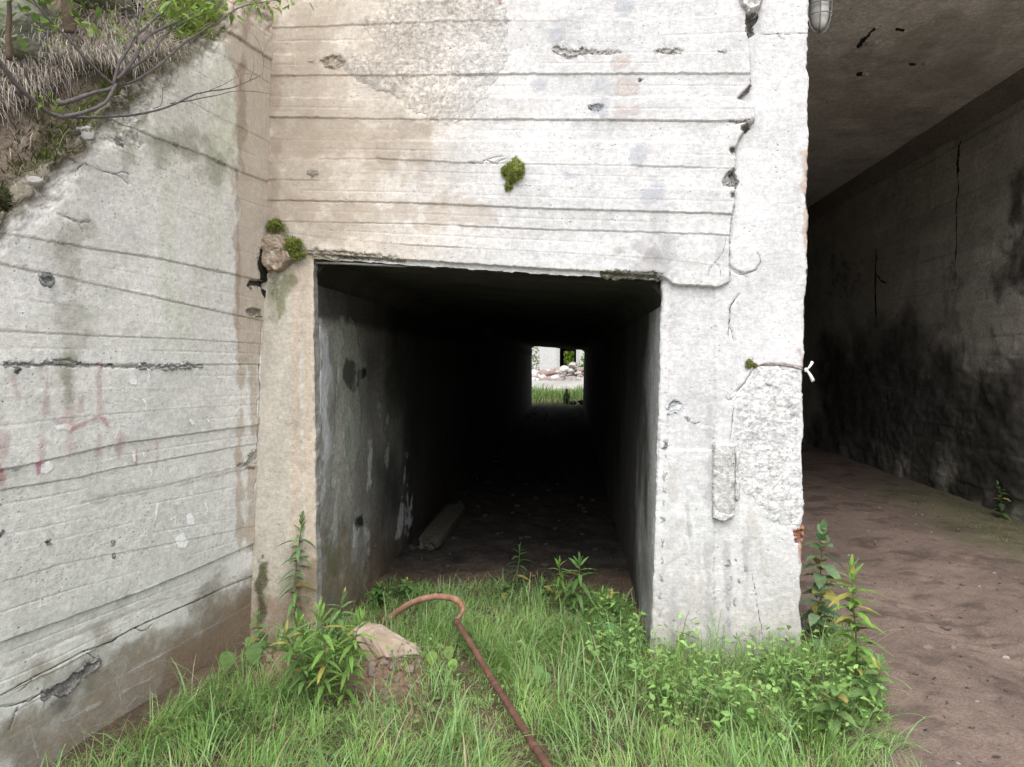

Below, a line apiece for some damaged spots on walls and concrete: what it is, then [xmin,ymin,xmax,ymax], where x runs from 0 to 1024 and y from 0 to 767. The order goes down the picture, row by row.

spalling [306,0,511,125]
spalling [551,44,617,59]
spalling [653,46,682,55]
spalling [721,168,740,198]
crack [953,140,961,281]
leakage [89,0,274,549]
spalling [246,247,268,318]
crack [705,215,761,341]
spalling [3,358,204,374]
spalling [40,655,102,701]